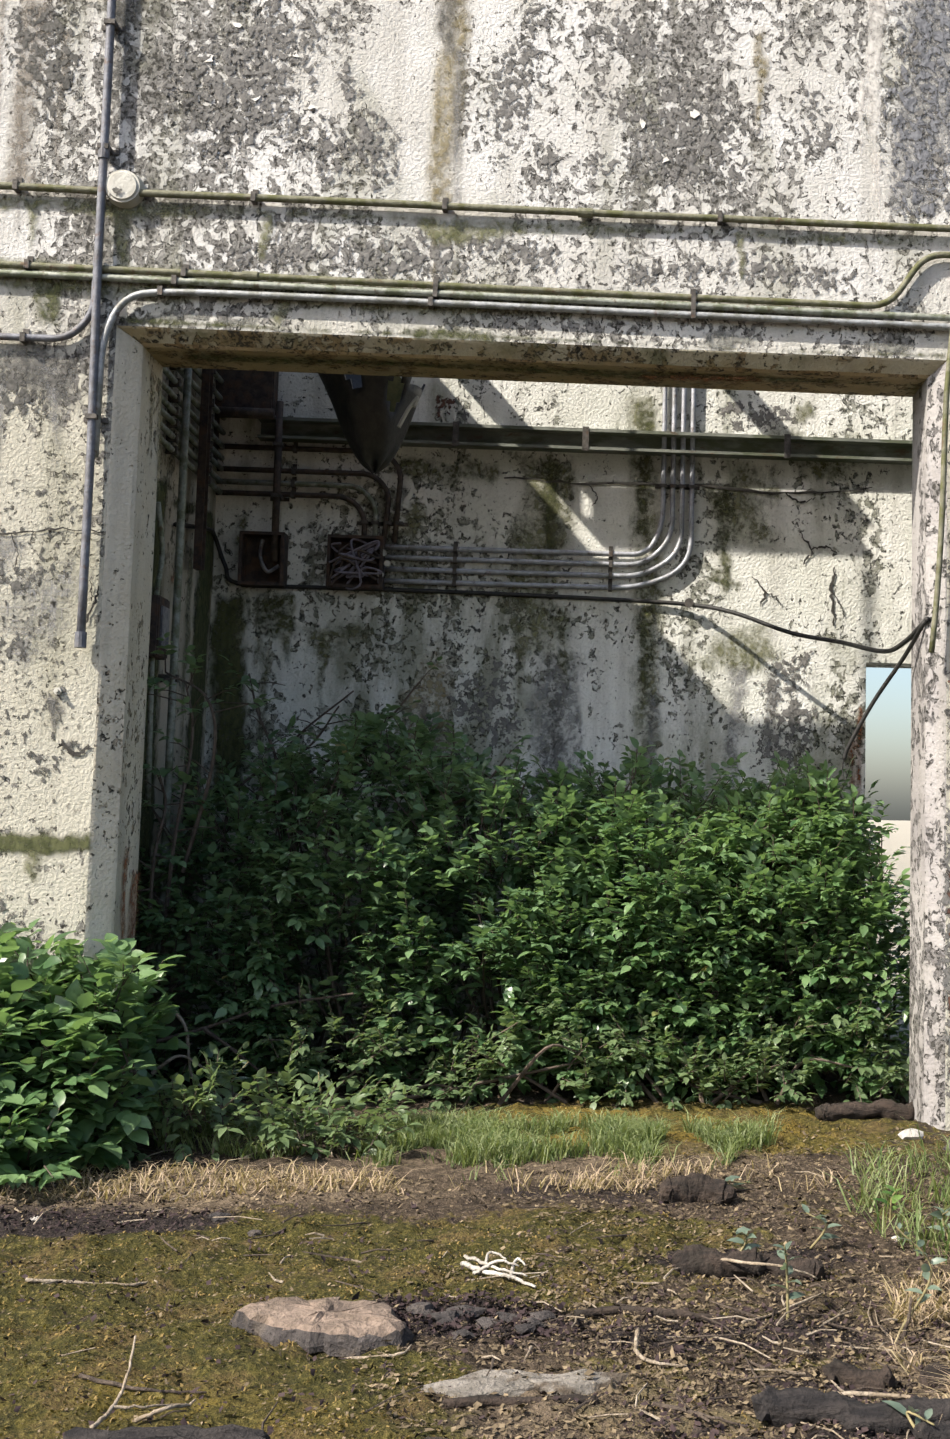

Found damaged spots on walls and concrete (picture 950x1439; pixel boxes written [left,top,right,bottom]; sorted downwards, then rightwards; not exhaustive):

peeling [3,0,84,128]
peeling [149,0,407,194]
water stain [428,0,469,202]
peeling [485,0,772,194]
peeling [217,224,574,281]
peeling [613,250,883,296]
crack [504,477,872,626]
water stain [709,486,740,590]
peeling [0,474,97,807]
water stain [531,611,579,791]
water stain [726,669,747,787]
water stain [0,832,90,876]